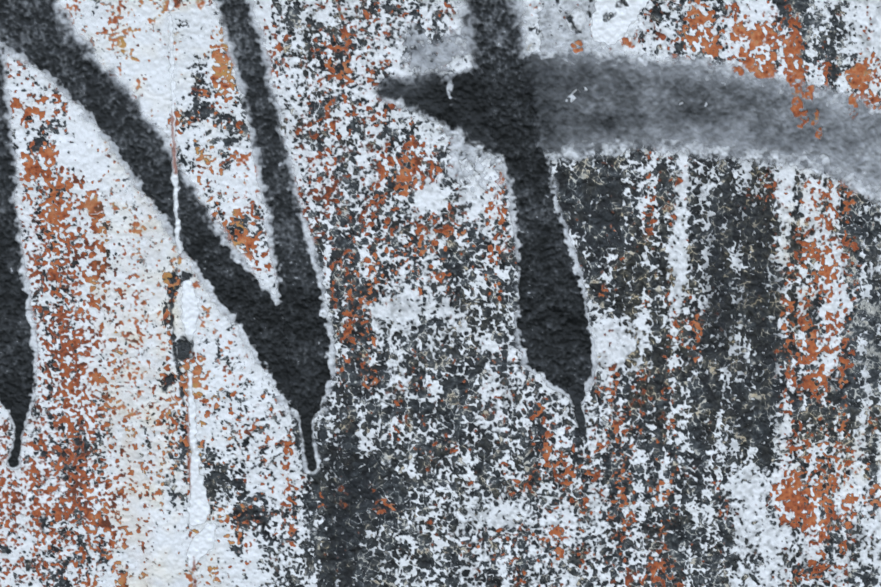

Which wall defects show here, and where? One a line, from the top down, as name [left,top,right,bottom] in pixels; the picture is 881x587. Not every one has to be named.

peeling [0,74,208,587]
spalling [162,0,272,273]
spalling [193,0,881,587]
crack [556,0,593,33]